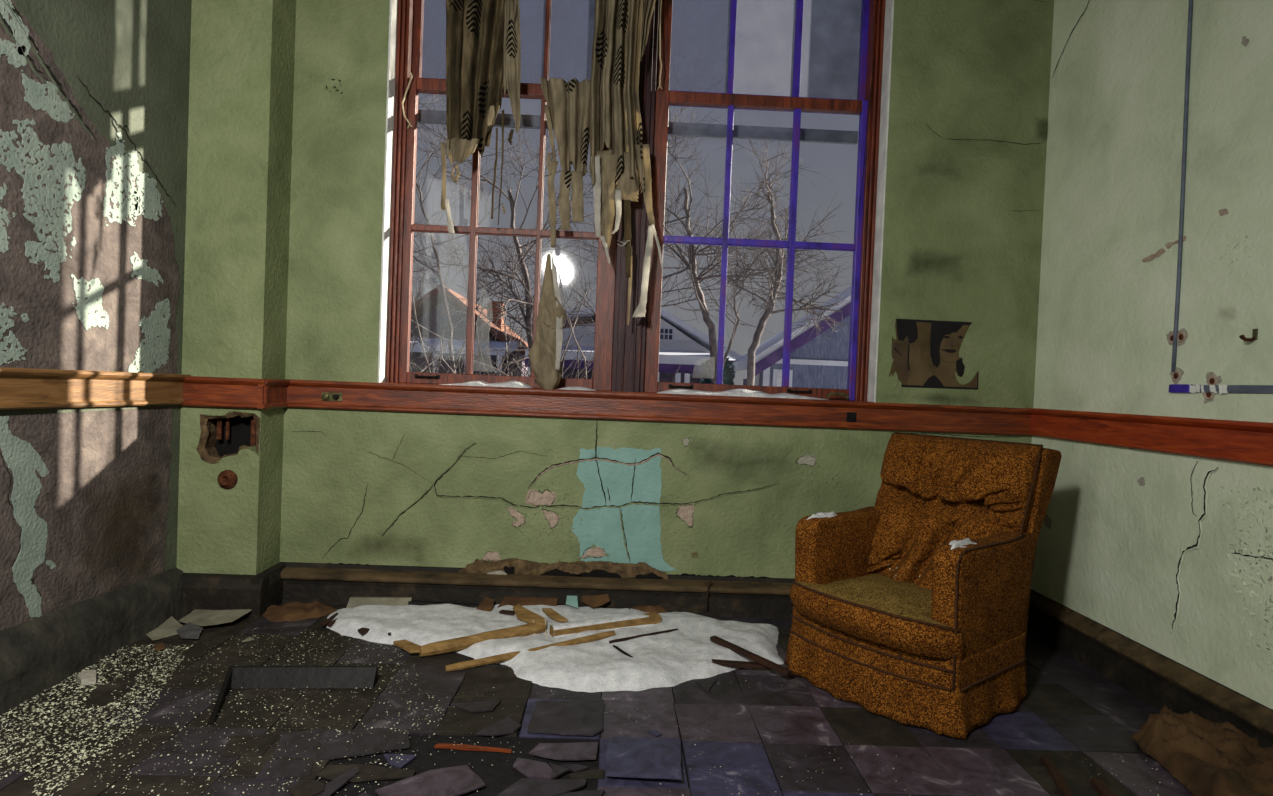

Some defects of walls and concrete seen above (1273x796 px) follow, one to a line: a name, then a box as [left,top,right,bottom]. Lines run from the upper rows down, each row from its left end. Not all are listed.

crack [1052,1,1089,78]
flaking render [0,0,180,374]
flaking render [0,407,174,631]
spalling [196,411,260,464]
crack [324,423,777,566]
flaking render [459,481,668,579]
crack [1171,461,1219,634]
crack [1233,553,1273,584]